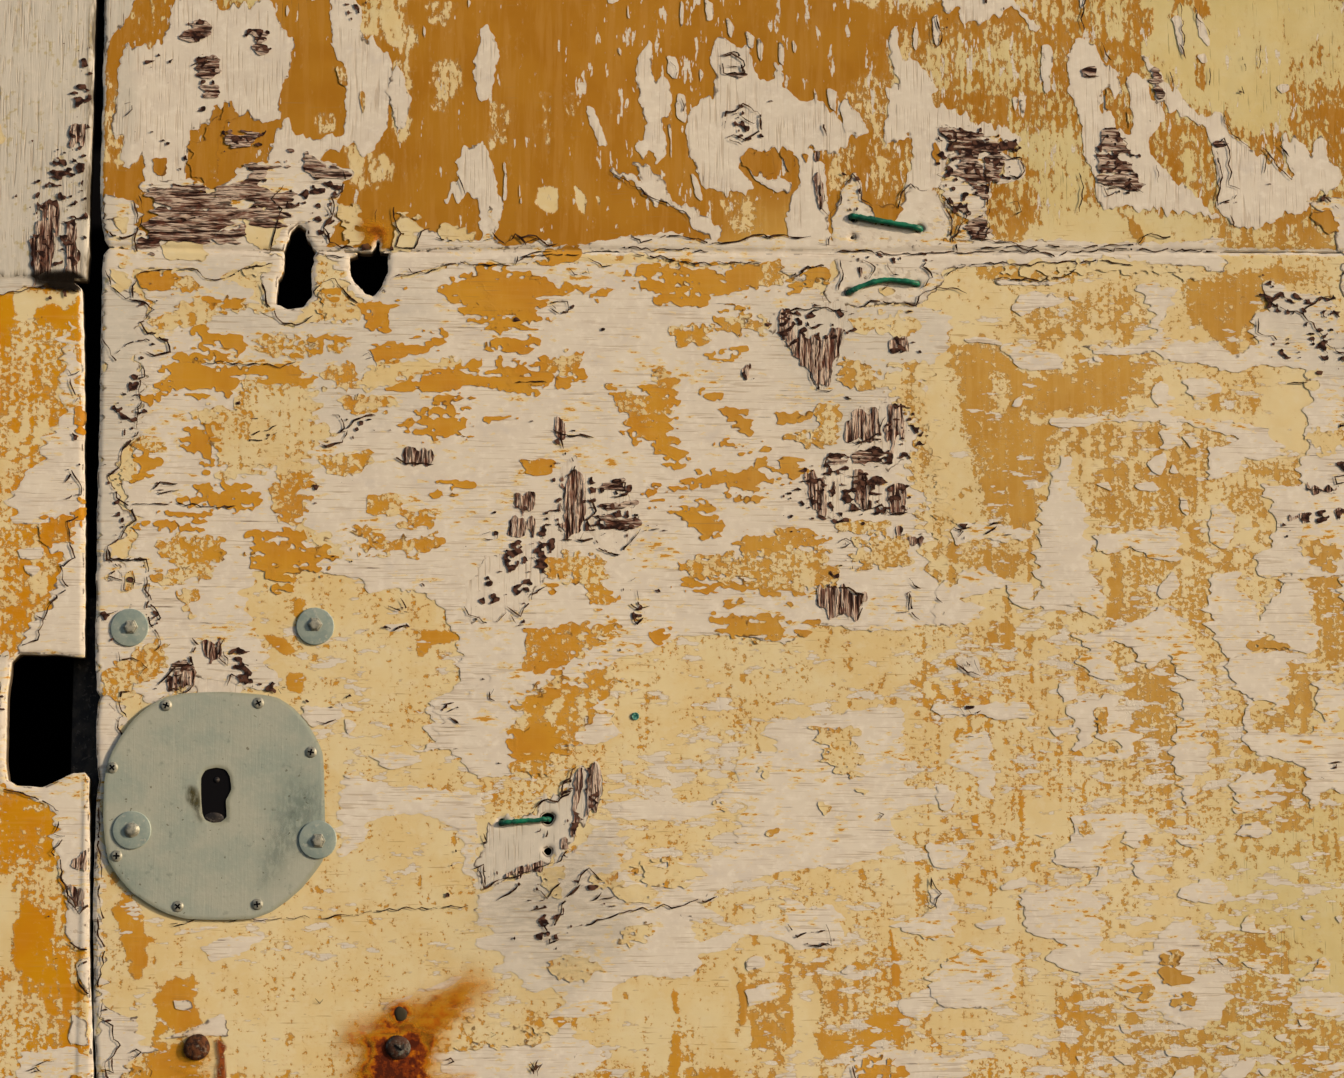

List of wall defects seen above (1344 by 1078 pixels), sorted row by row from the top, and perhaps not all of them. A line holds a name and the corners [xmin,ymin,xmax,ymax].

peeling [4,322,87,657]
peeling [95,0,1228,809]
peeling [1049,38,1344,809]
peeling [4,773,89,950]
peeling [16,1015,93,1078]
peeling [76,957,91,998]
peeling [89,807,159,1078]
corrosion [217,1039,226,1078]
corrosion [347,982,478,1078]
peeling [334,707,971,1078]
peeling [1001,812,1270,1028]
peeling [1228,769,1277,838]